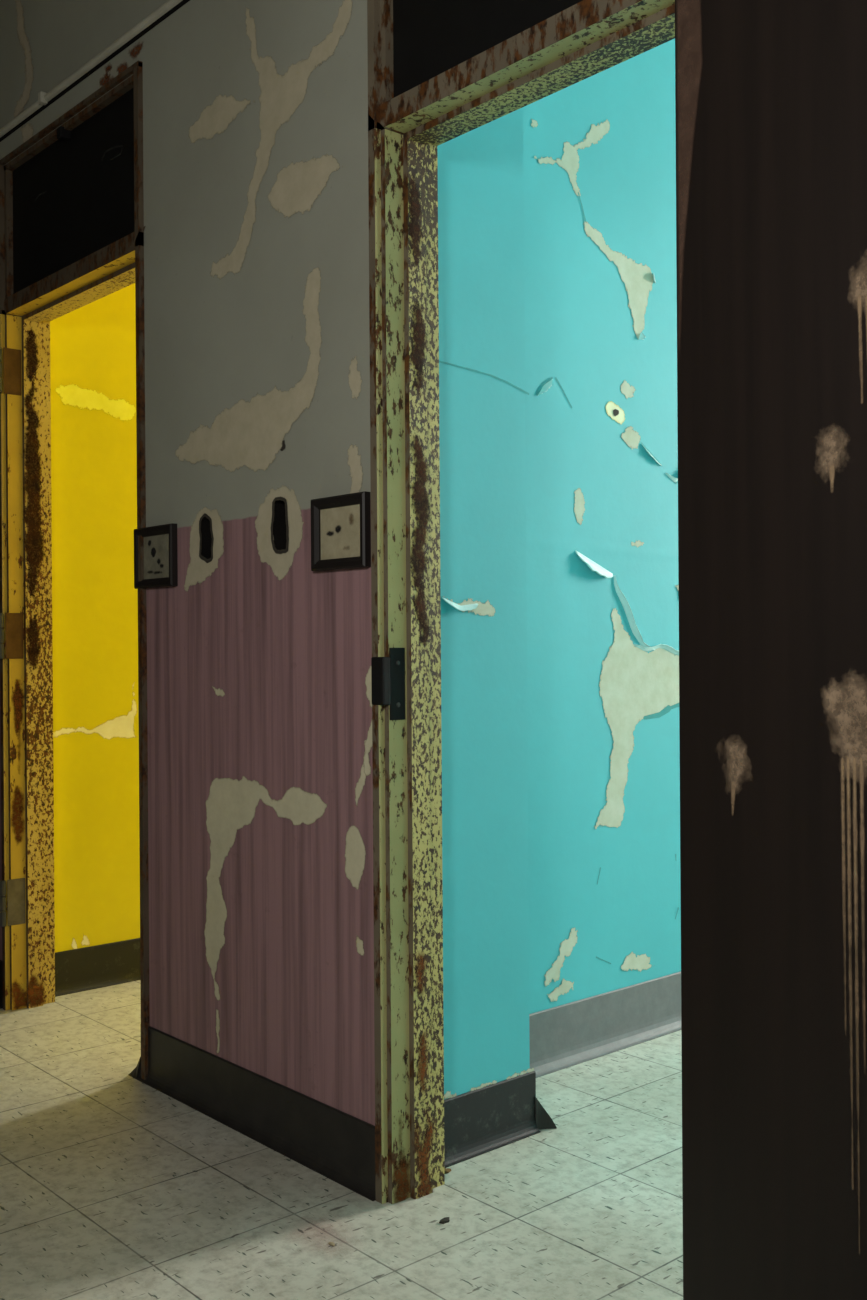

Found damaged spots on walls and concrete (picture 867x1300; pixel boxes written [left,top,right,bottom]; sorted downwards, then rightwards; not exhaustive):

peeling [534,120,656,340]
rust [411,299,427,396]
crack [439,361,572,408]
peeling [606,380,678,484]
rust [23,330,46,669]
spalling [255,485,304,581]
rust [411,436,431,645]
peeling [575,550,679,829]
rust [10,976,45,1009]
peeling [204,776,328,1054]
peeling [544,928,578,1002]
rust [393,1116,434,1203]